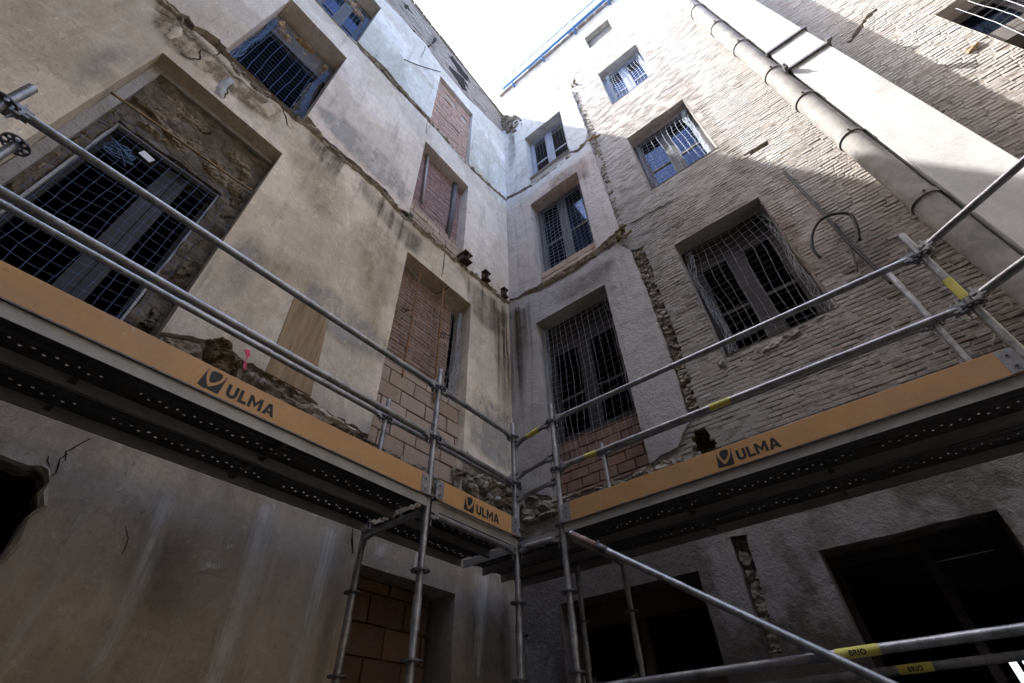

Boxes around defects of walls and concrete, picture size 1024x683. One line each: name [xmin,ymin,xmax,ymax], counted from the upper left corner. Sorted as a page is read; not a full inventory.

crack [282,106,387,192]
spalling [361,49,624,303]
spalling [633,248,699,413]
spalling [0,455,51,565]
crack [47,439,90,476]
leakage [208,504,273,683]
spalling [733,539,782,654]